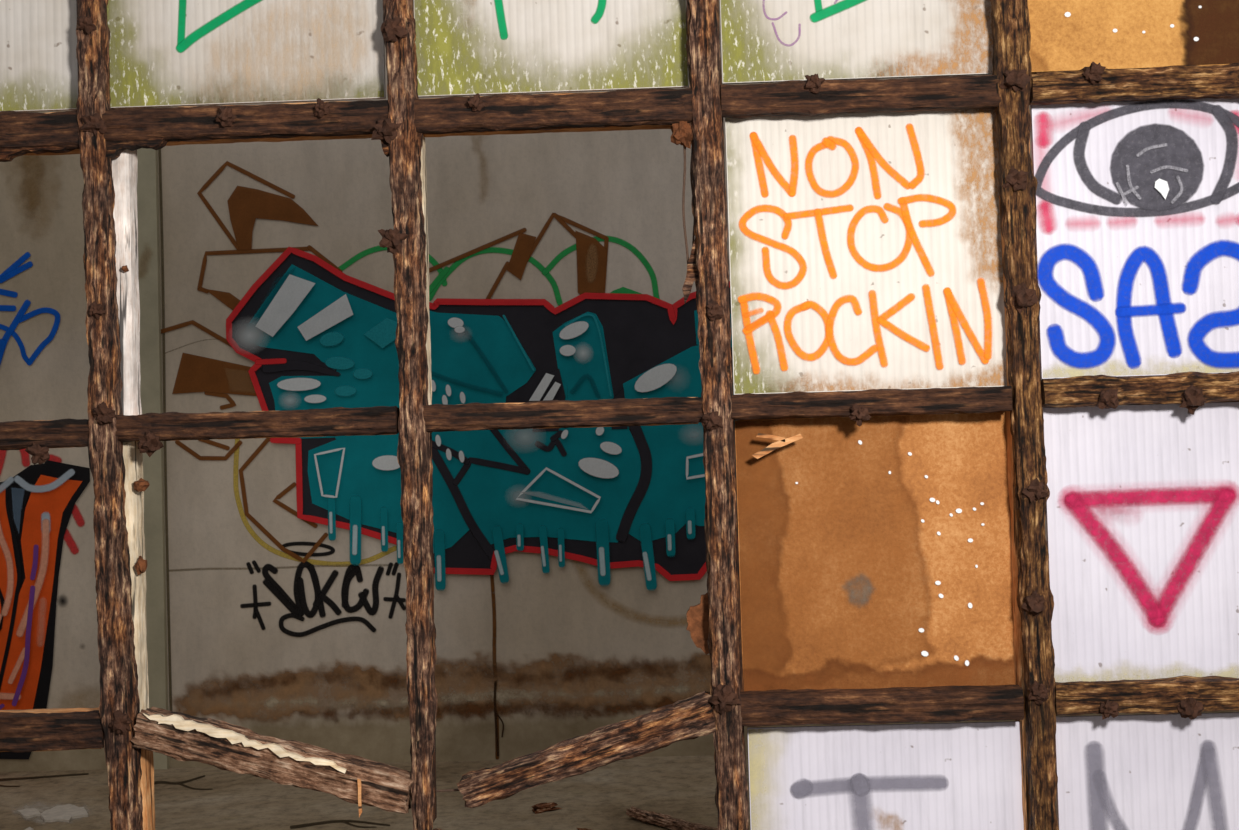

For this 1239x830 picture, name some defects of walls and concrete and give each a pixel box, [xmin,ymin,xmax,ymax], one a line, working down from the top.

water stain [175,663,409,721]
water stain [435,654,711,720]